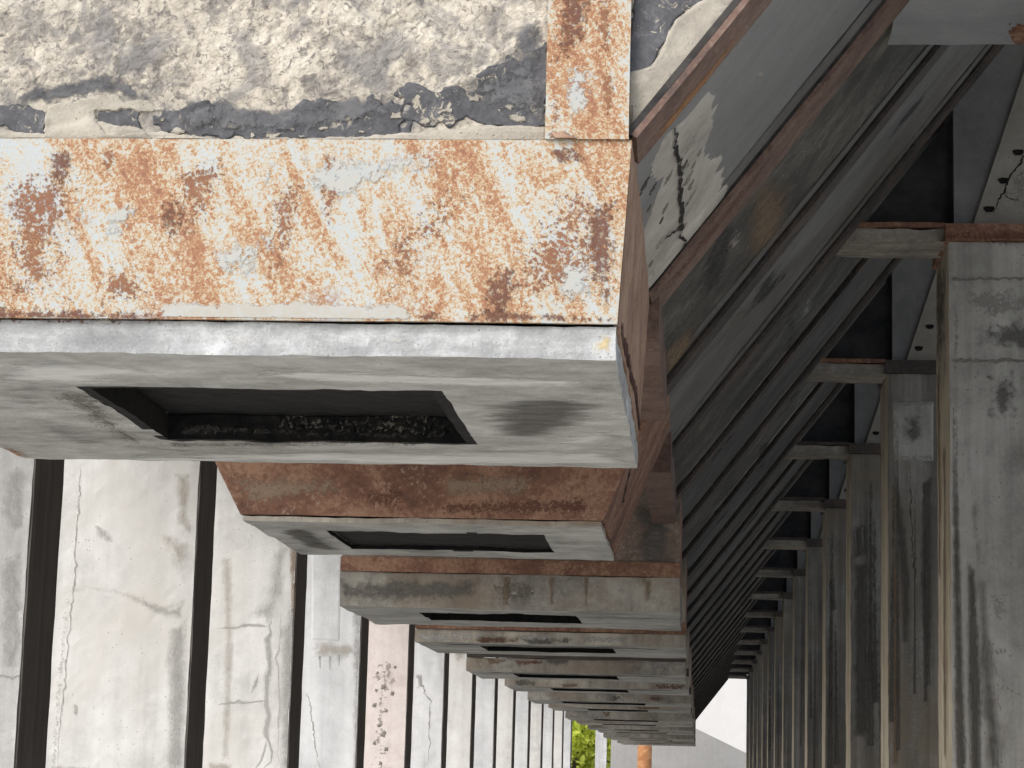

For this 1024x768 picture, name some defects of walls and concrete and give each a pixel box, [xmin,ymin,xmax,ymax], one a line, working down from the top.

peeling [0,42,578,151]
corrosion [551,0,611,63]
peeling [629,0,732,138]
corrosion [0,151,161,324]
corrosion [161,158,224,241]
corrosion [468,180,618,322]
crack [660,128,698,253]
peeling [640,92,728,288]
crack [57,471,81,760]
crack [217,621,272,767]
leakage [854,448,931,767]
leakage [954,493,998,768]